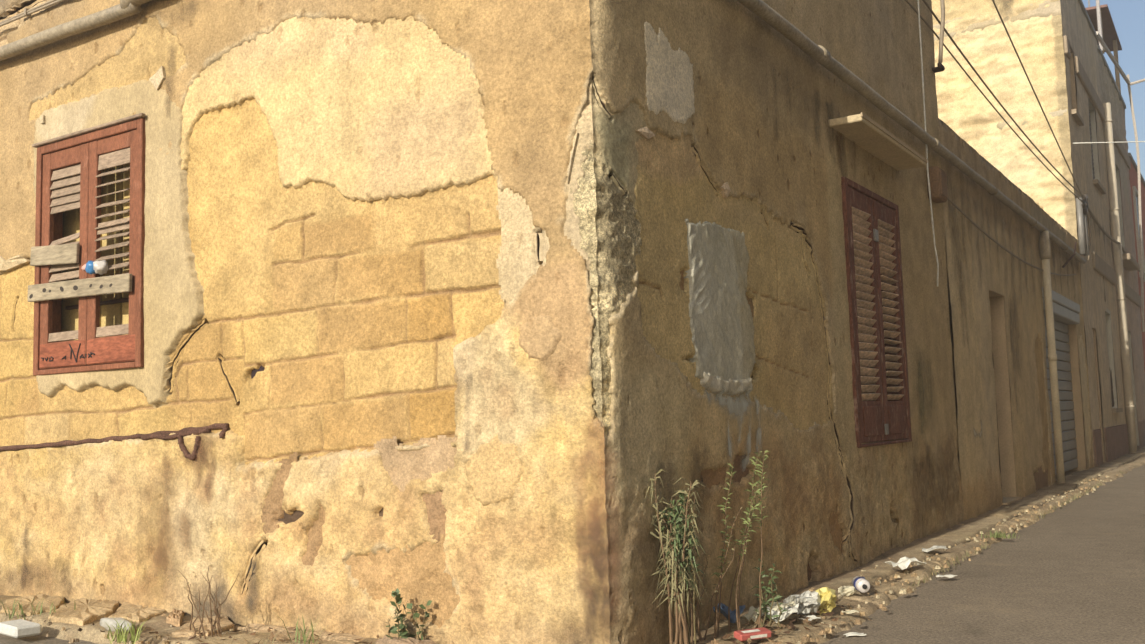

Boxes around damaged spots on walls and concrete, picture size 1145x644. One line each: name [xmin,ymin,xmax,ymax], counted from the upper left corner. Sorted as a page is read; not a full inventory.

crack [0,0,46,22]
crack [591,76,612,118]
crack [691,145,717,195]
flaking render [564,73,836,436]
flaking render [0,16,550,628]
crack [761,211,858,564]
flaking render [700,455,749,489]